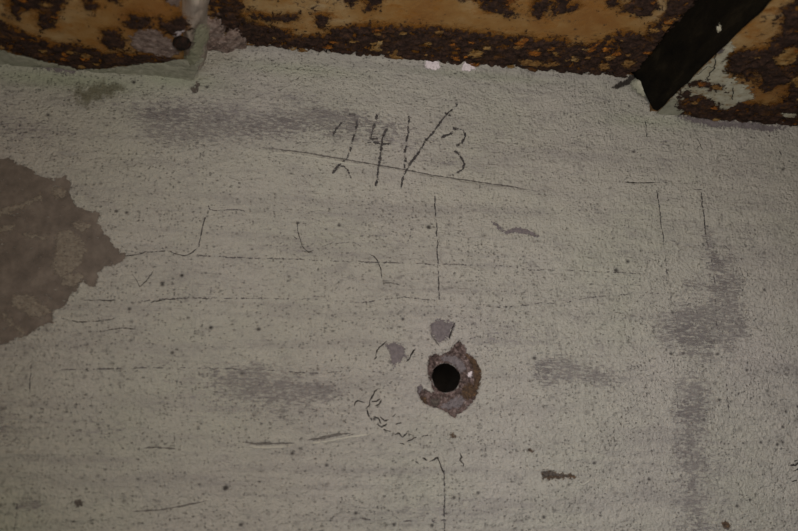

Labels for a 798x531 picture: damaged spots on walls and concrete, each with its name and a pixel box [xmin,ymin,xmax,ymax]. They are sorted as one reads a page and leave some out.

corrosion [0,0,194,75]
corrosion [208,0,697,78]
corrosion [675,0,798,132]
corrosion [461,355,482,399]
crack [354,389,428,445]
crack [415,454,464,474]